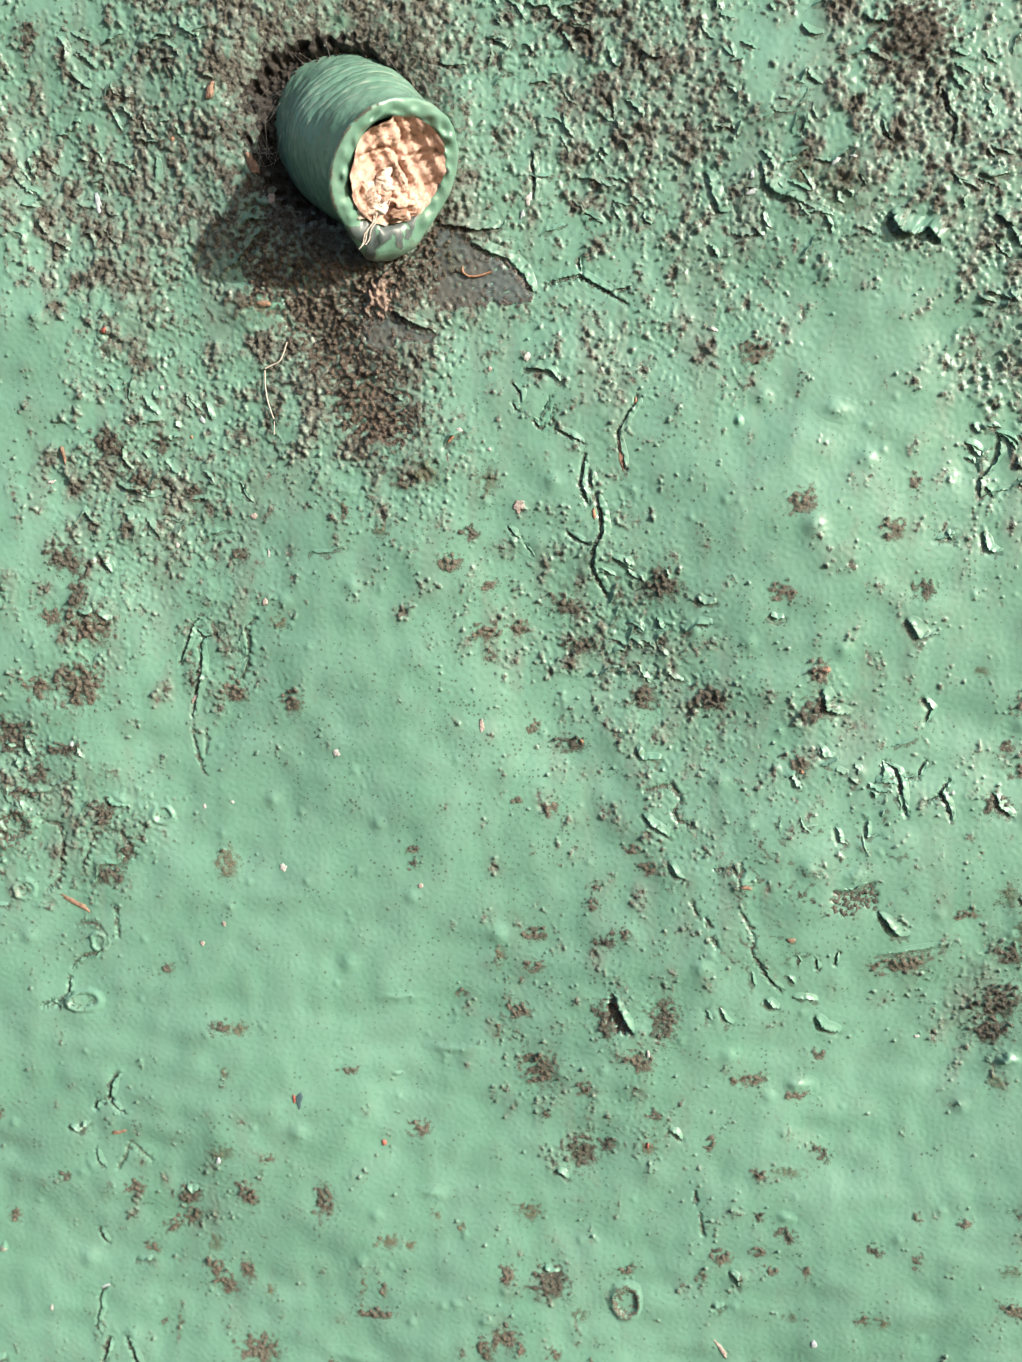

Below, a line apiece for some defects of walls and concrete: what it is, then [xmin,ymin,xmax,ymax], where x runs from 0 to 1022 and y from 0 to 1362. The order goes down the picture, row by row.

peeling [55,20,221,183]
spalling [222,29,557,459]
peeling [485,0,591,158]
crack [544,257,631,305]
peeling [541,99,653,237]
peeling [703,66,871,258]
peeling [859,204,951,244]
crack [179,613,258,774]
peeling [600,554,717,685]
peeling [904,615,942,641]
peeling [788,862,949,959]
peeling [608,993,635,1037]